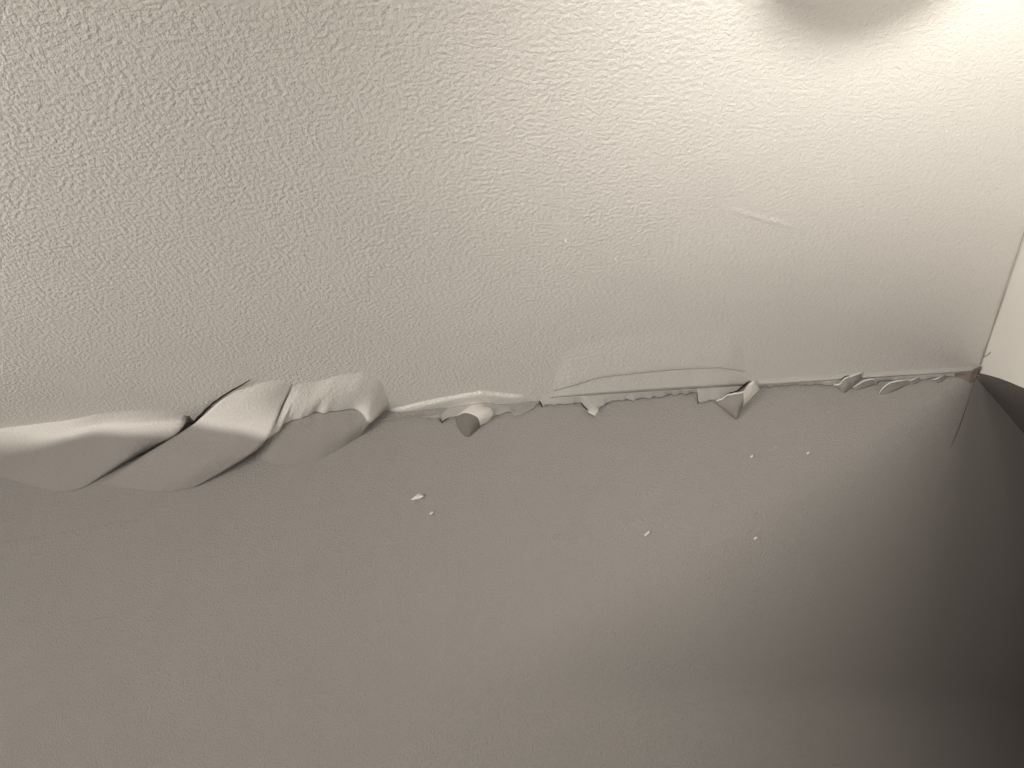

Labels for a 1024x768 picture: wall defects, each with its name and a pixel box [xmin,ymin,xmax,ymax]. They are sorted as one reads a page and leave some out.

peeling [716,365,981,419]
peeling [456,405,493,437]